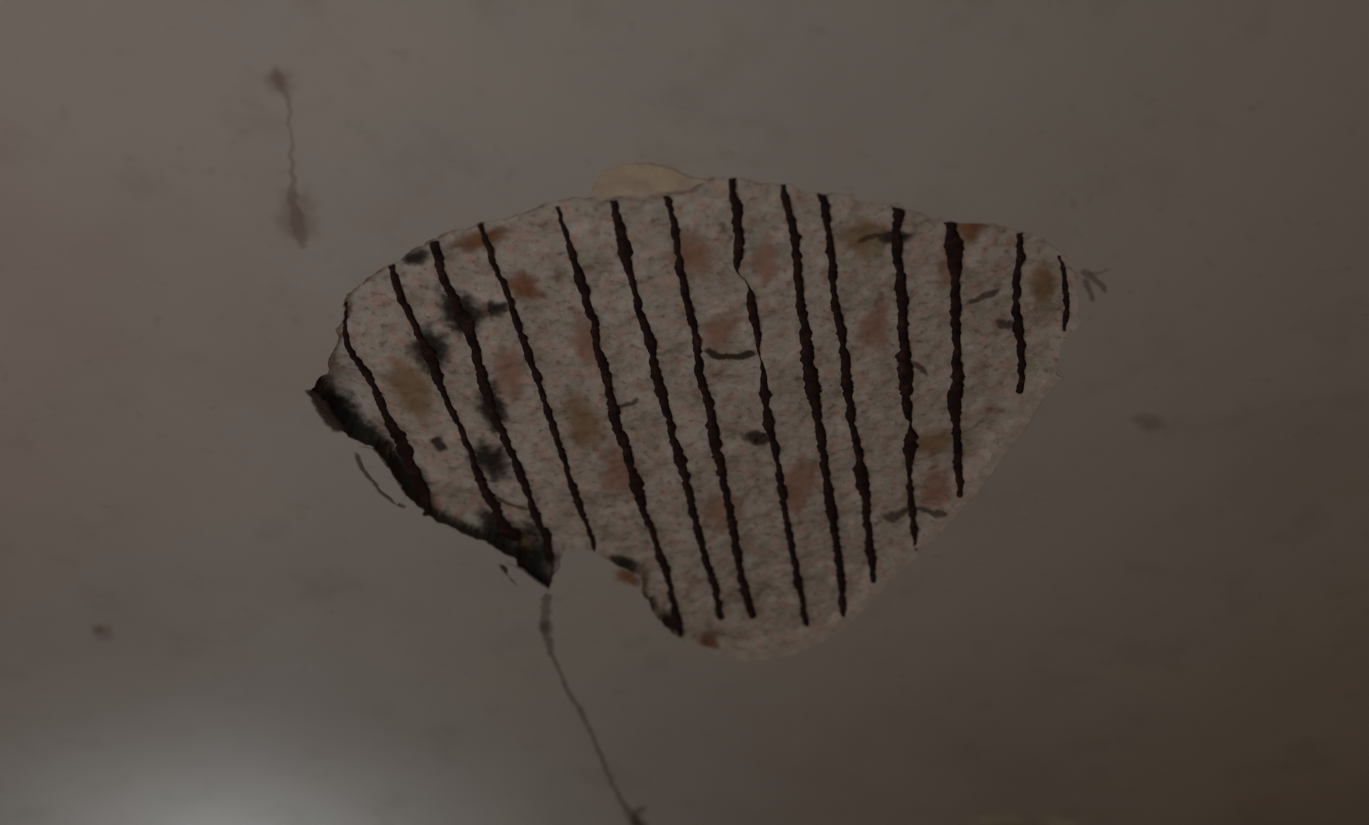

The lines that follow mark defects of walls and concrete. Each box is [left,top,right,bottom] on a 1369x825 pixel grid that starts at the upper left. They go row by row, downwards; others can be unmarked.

spalling [306,163,1080,661]